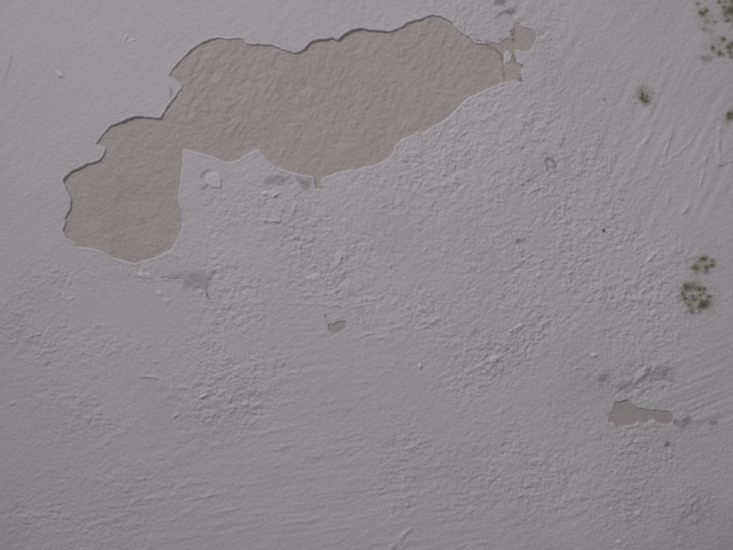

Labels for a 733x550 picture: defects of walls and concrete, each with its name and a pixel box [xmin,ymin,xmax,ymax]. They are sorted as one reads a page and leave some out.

peeling [60,0,538,266]
peeling [607,398,688,429]